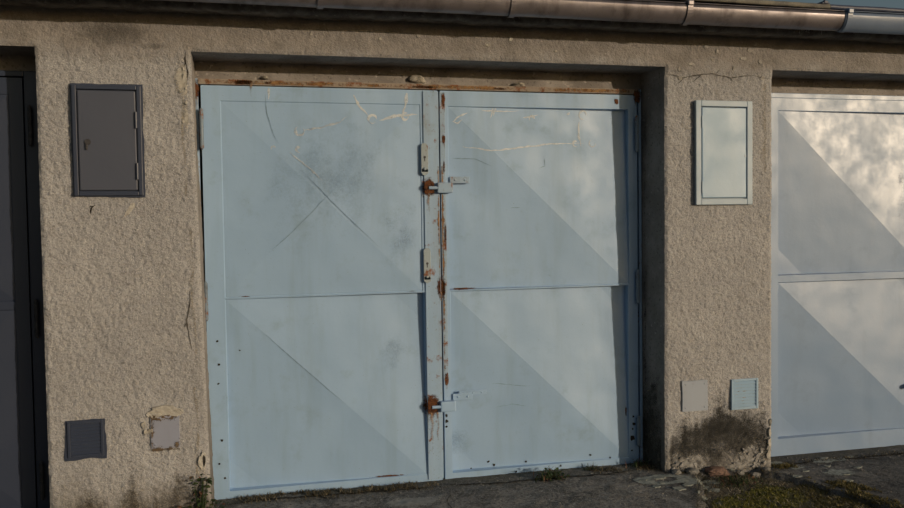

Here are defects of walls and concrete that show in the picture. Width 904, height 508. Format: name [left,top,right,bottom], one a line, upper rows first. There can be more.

rust [219,80,386,88]
crack [670,69,761,84]
rust [400,85,509,109]
rust [554,89,641,104]
rust [422,162,474,385]
rust [423,395,439,422]
damp [643,385,768,470]